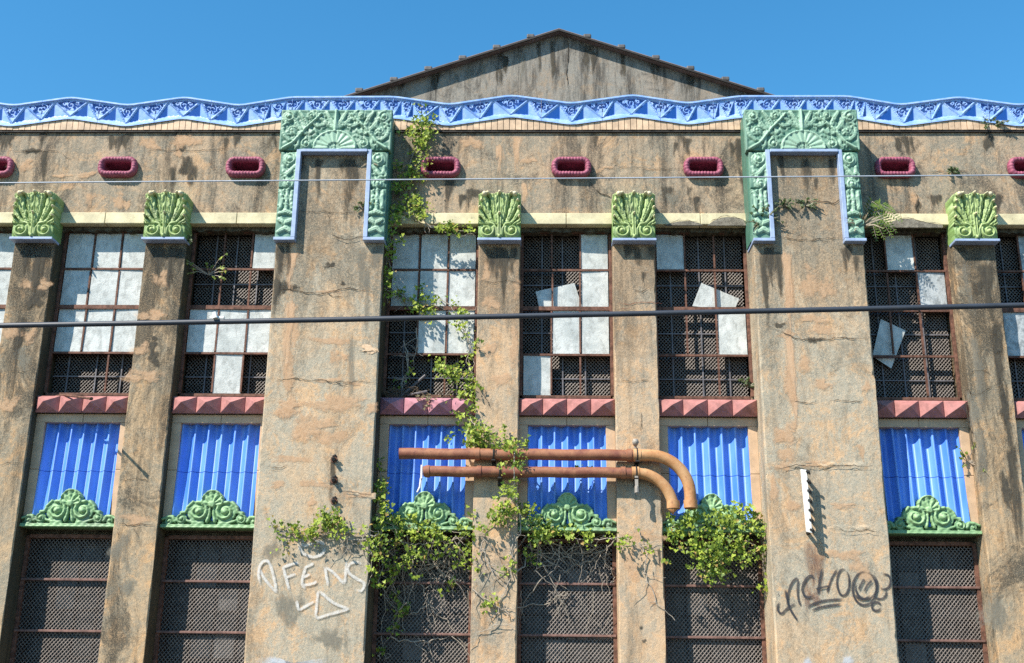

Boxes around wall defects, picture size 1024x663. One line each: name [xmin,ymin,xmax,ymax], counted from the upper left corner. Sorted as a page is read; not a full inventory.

water stain [496,53,525,83]
water stain [537,42,556,75]
crack [277,285,370,297]
crack [772,323,869,343]
crack [268,378,374,386]